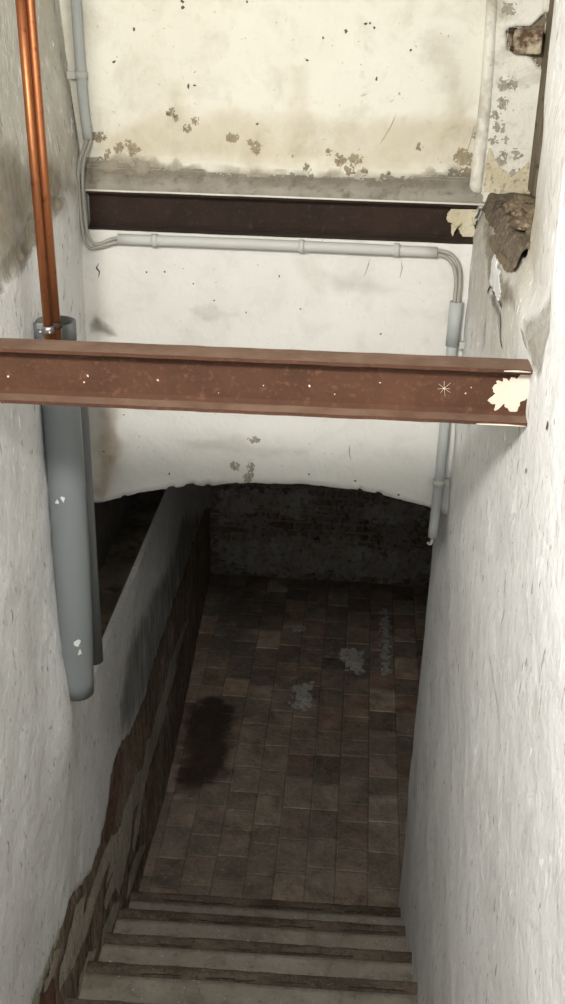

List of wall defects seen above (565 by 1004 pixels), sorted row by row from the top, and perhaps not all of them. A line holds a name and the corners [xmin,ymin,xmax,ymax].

leakage [91,158,203,177]
spalling [488,234,528,272]
leakage [177,698,234,785]